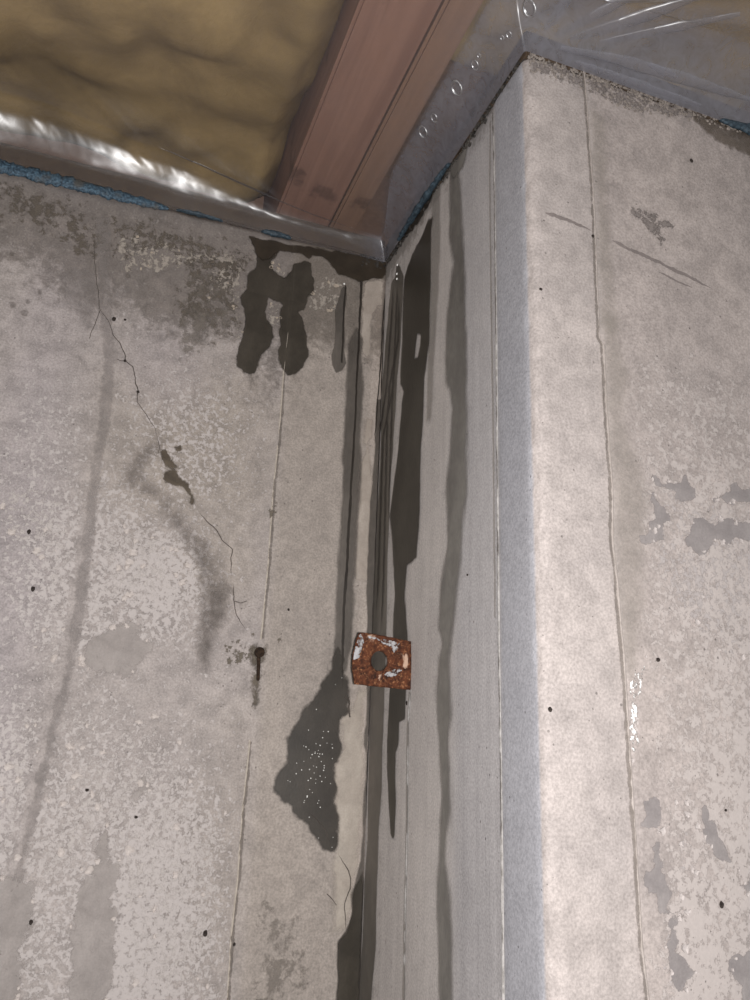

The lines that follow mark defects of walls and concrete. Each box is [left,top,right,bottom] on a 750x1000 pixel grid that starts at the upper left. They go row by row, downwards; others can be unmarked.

crack [89,238,160,453]
water stain [0,182,432,1000]
crack [201,515,247,631]
rust [250,645,267,706]
water stain [437,139,470,1000]